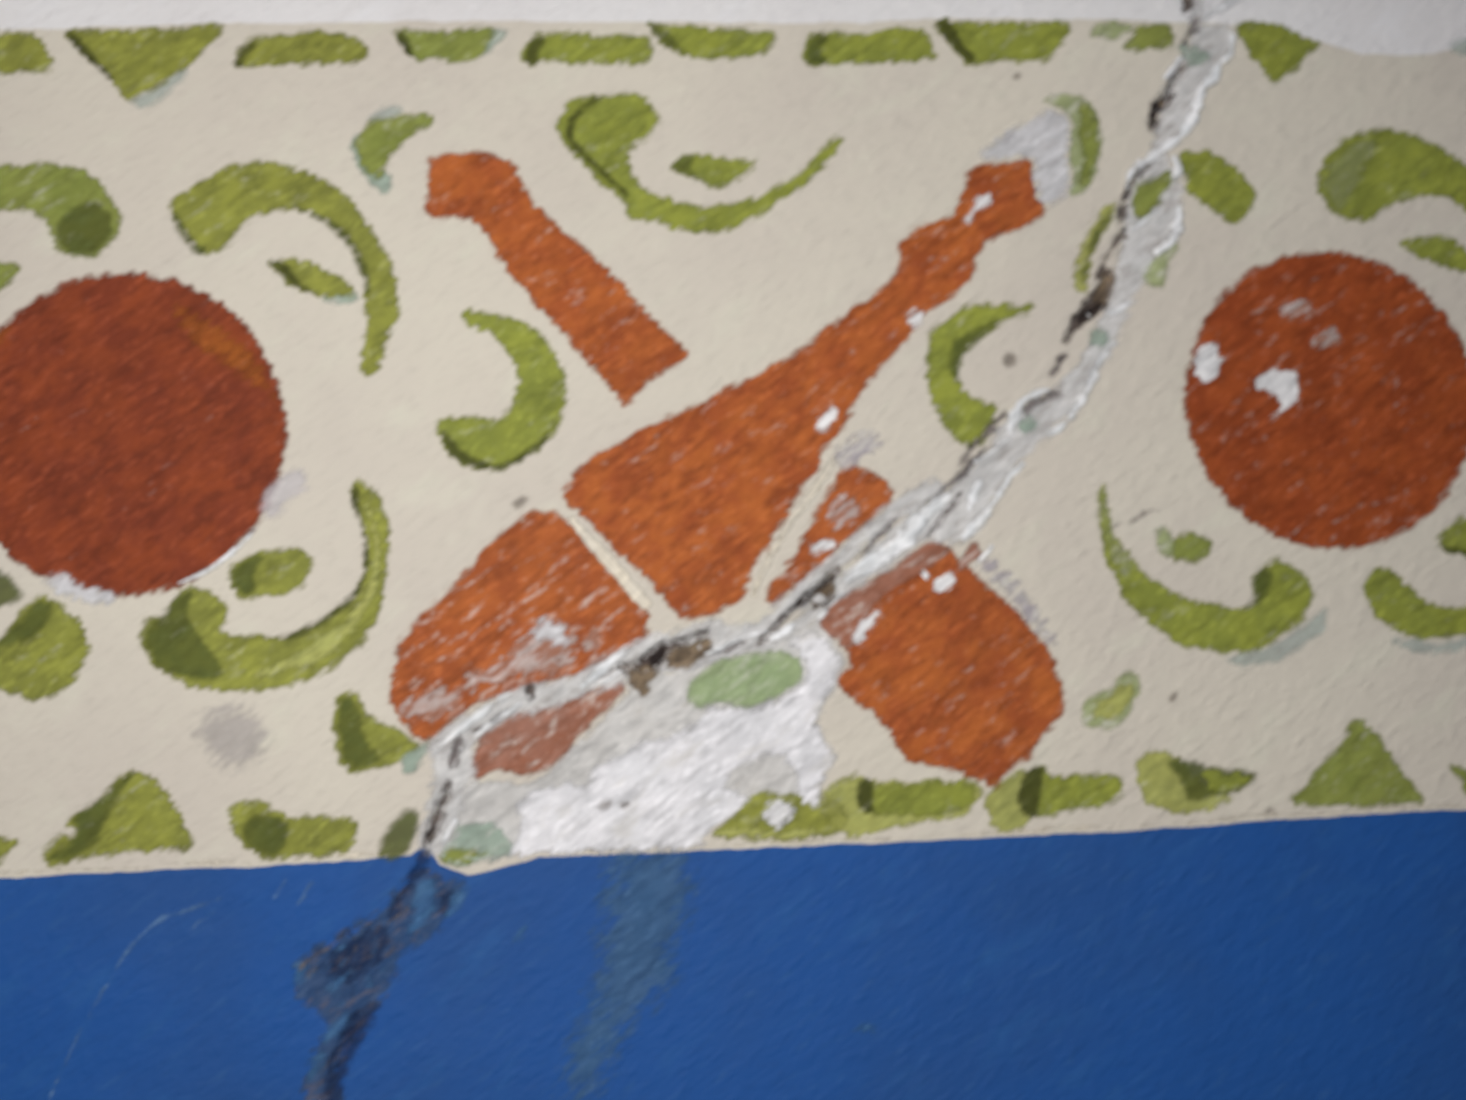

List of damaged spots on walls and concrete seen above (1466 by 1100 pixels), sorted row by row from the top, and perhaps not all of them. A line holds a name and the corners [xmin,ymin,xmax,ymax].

crack [419,0,1240,855]
peeling [1193,343,1224,383]
peeling [1255,367,1299,413]
peeling [398,616,601,722]
spalling [447,611,880,863]